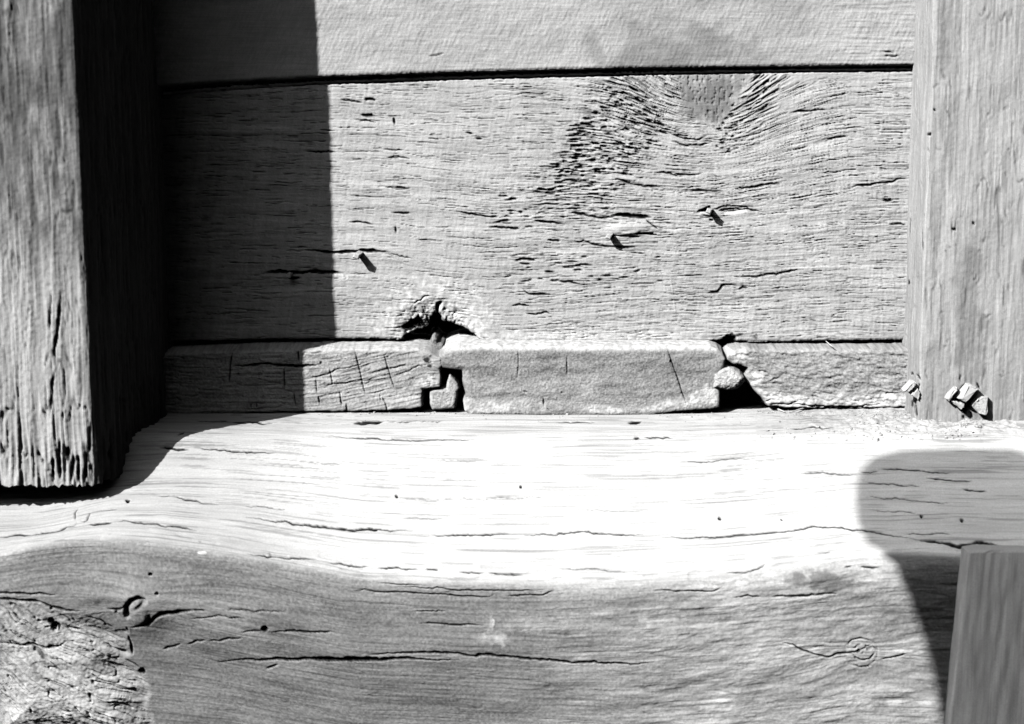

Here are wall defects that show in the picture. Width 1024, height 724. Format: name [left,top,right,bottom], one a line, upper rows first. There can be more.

crack [261,507,402,532]
crack [680,469,994,549]
crack [0,592,629,668]
crack [796,637,902,667]